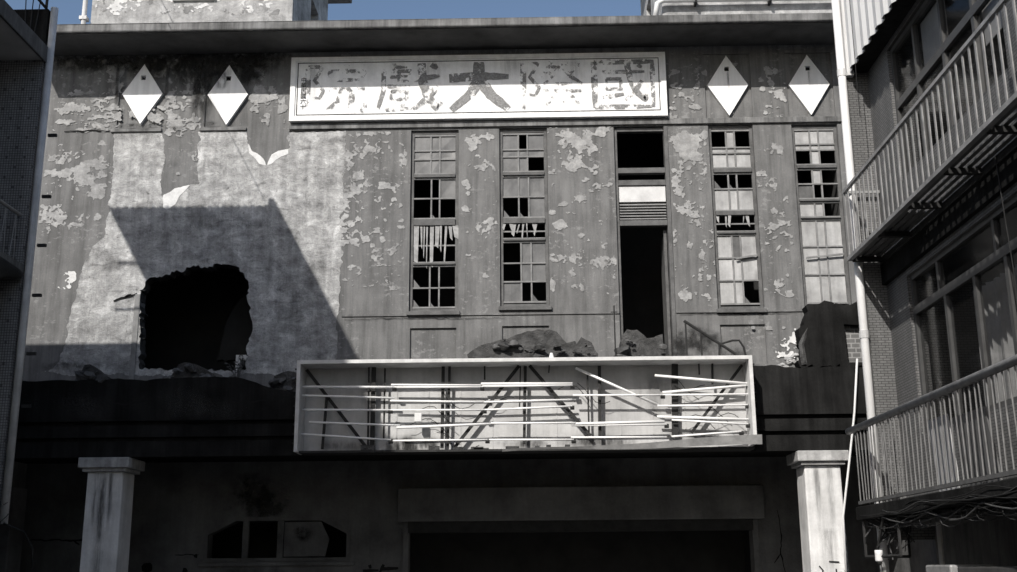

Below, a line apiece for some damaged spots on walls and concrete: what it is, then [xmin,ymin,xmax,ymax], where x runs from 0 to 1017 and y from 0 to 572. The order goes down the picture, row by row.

peeling [95,0,143,15]
leakage [54,53,284,110]
peeling [667,64,707,118]
peeling [758,66,787,117]
flaking render [39,55,407,377]
peeling [547,125,617,294]
peeling [669,130,716,302]
peeling [756,161,793,257]
peeling [764,263,794,298]